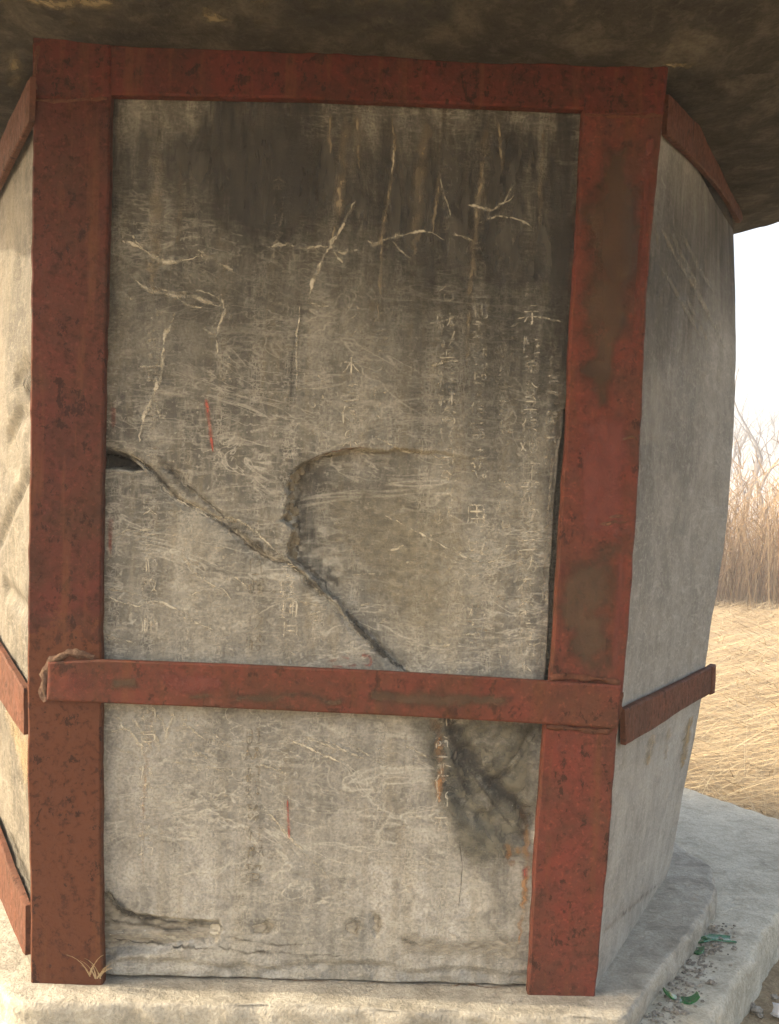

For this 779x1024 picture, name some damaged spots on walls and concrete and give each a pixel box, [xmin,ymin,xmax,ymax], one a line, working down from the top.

crack [128,455,402,667]
water stain [418,722,535,863]